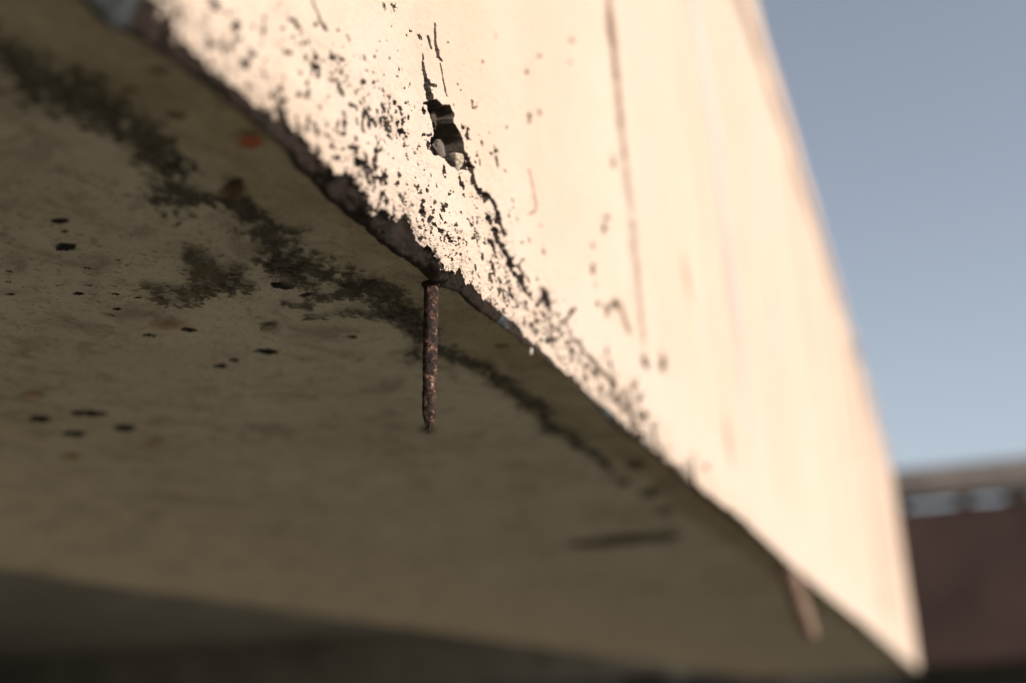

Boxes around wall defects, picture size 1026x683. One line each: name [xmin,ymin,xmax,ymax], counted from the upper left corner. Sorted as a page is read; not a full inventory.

spalling [81,0,139,31]
spalling [50,218,78,251]
water stain [0,22,424,365]
spalling [68,410,136,432]
water stain [437,328,616,474]
spalling [155,0,919,670]